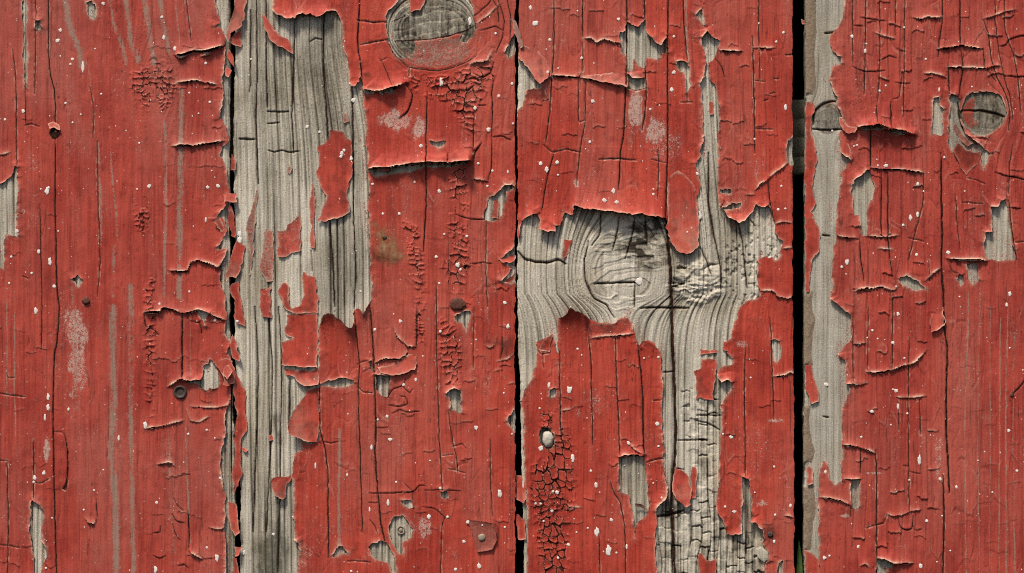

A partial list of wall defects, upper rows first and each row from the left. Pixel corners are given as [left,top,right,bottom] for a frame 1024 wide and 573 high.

peeling [0,166,19,269]
crack [132,1,219,108]
peeling [177,0,477,573]
crack [311,0,511,573]
crack [519,0,719,573]
peeling [499,9,783,573]
peeling [784,0,908,573]
crack [813,0,1024,573]
peeling [957,199,1015,286]